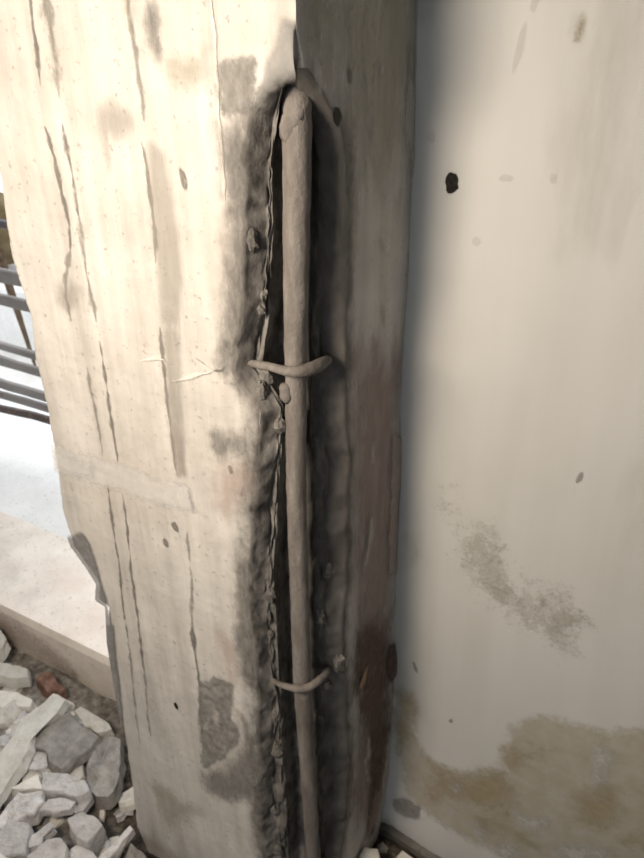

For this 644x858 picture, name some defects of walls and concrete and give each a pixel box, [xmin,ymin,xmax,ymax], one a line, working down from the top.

spalling [198,58,353,858]
damp [201,737,250,800]
rust [353,622,393,839]
damp [397,695,644,858]